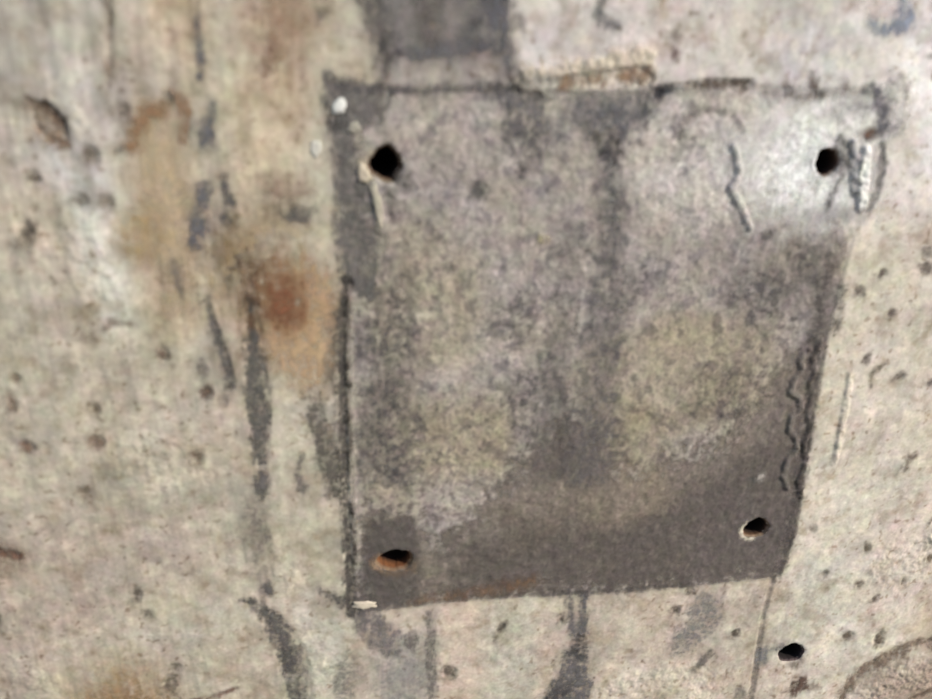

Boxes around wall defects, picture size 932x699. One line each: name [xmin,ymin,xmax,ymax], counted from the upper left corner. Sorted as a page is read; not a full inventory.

rust [225,242,340,388]